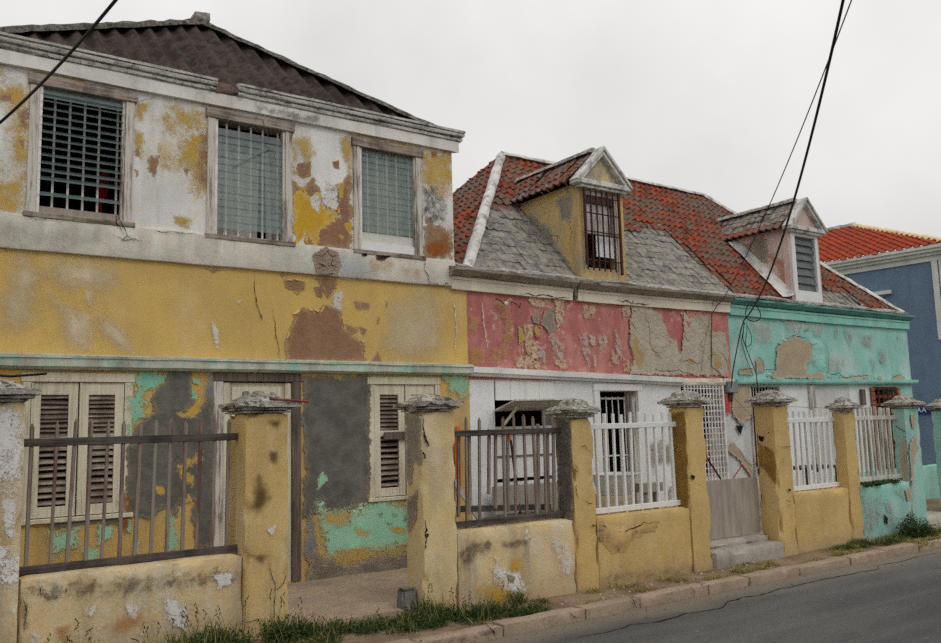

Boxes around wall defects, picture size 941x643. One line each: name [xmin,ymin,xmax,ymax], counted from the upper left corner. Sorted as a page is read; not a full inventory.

spalling [209,81,245,97]
peeling [0,64,30,213]
peeling [134,104,229,193]
peeling [281,134,454,362]
peeling [514,287,605,370]
peeling [611,305,905,484]
water stain [0,405,25,589]
peeling [305,412,430,581]
spalling [651,411,695,508]
water stain [29,566,241,601]
peeling [163,595,189,631]
peeling [487,557,528,603]